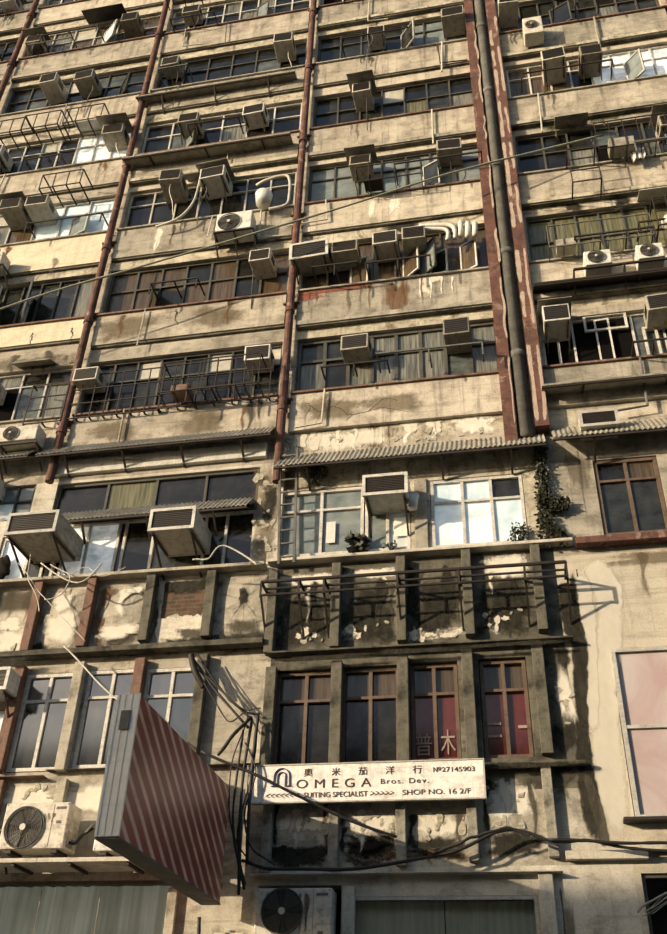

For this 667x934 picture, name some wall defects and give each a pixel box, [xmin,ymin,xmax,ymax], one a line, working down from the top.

corrosion [386,279,408,310]
water stain [247,399,263,430]
peeling [296,415,495,451]
water stain [611,552,667,590]
peeling [0,617,23,652]
peeling [45,592,77,644]
peeling [98,586,144,640]
spalling [155,578,206,643]
peeling [408,626,463,643]
peeling [485,779,536,833]
peeling [344,809,395,854]
peeling [416,811,466,850]